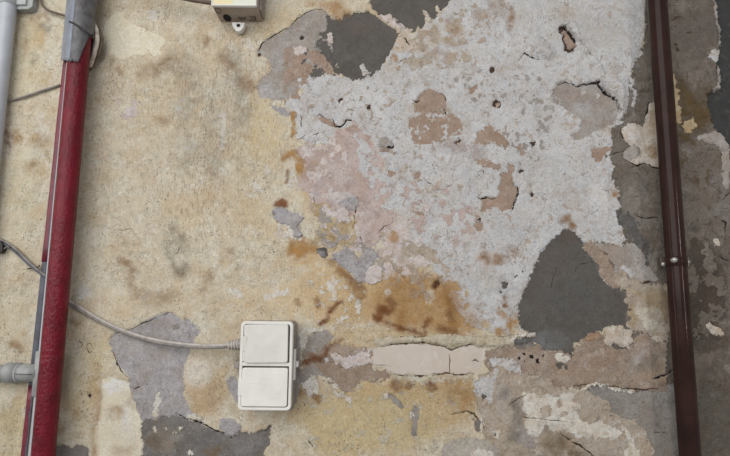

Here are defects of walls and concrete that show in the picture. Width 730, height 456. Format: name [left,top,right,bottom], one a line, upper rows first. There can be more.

crack [298,114,352,140]
crack [557,80,619,108]
rust [290,241,317,257]
peeling [244,0,679,456]
peeling [668,0,730,456]
peeling [56,313,272,456]